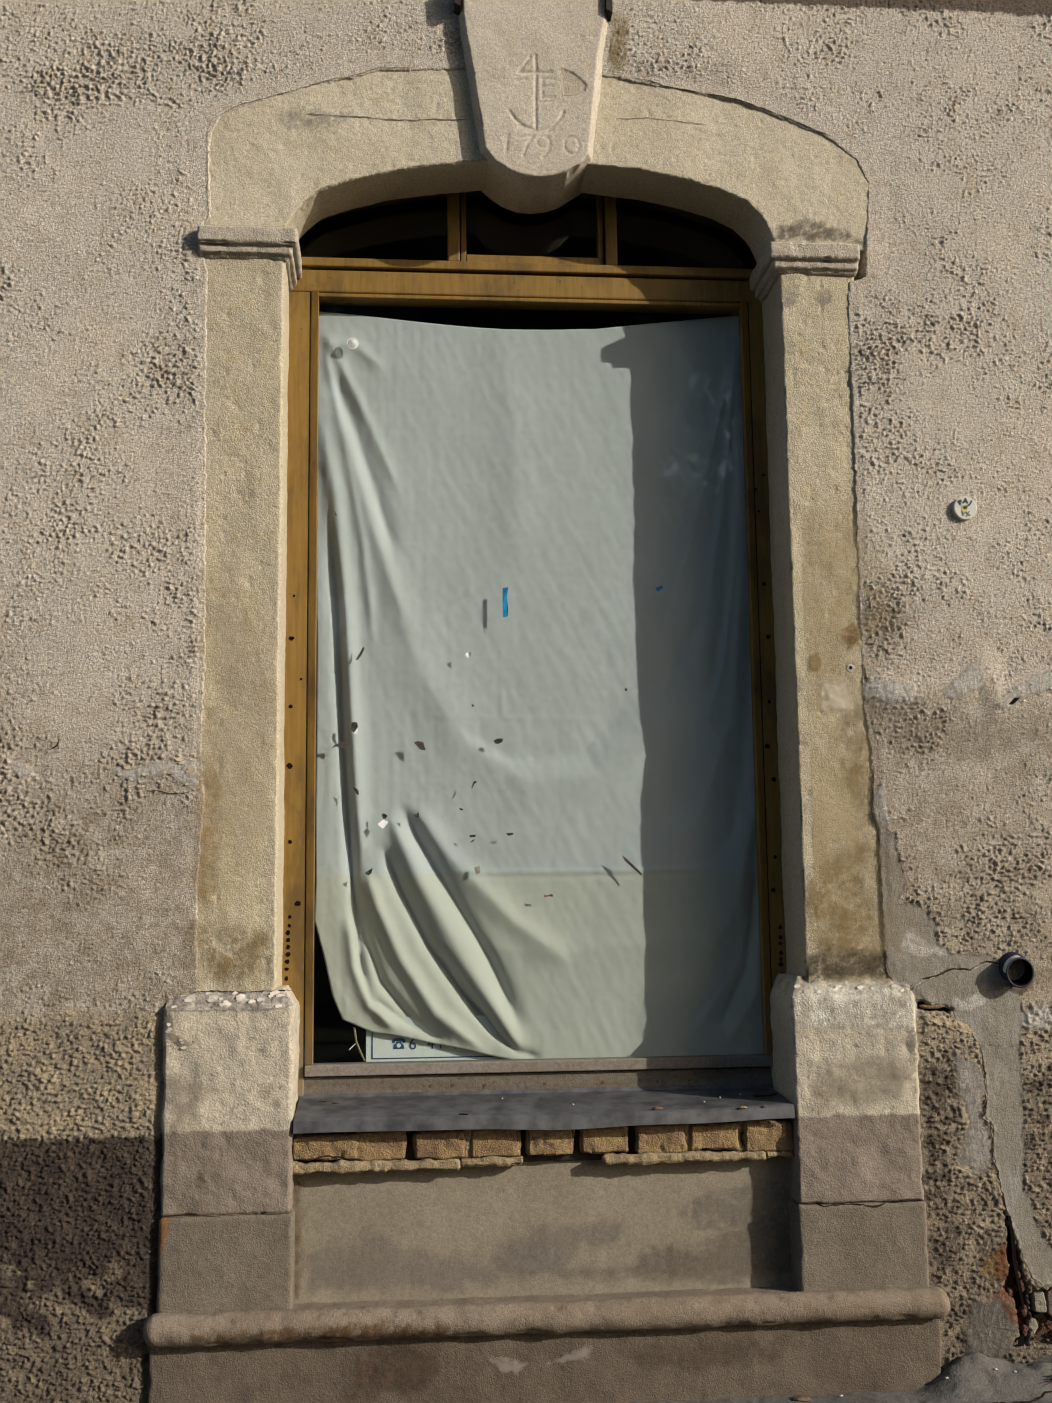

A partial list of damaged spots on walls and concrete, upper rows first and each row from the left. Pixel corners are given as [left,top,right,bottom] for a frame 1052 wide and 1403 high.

crack [206,67,466,220]
water stain [802,819,886,980]
crack [910,961,999,991]
crack [967,1045,1007,1210]
spalling [1003,1216,1052,1346]